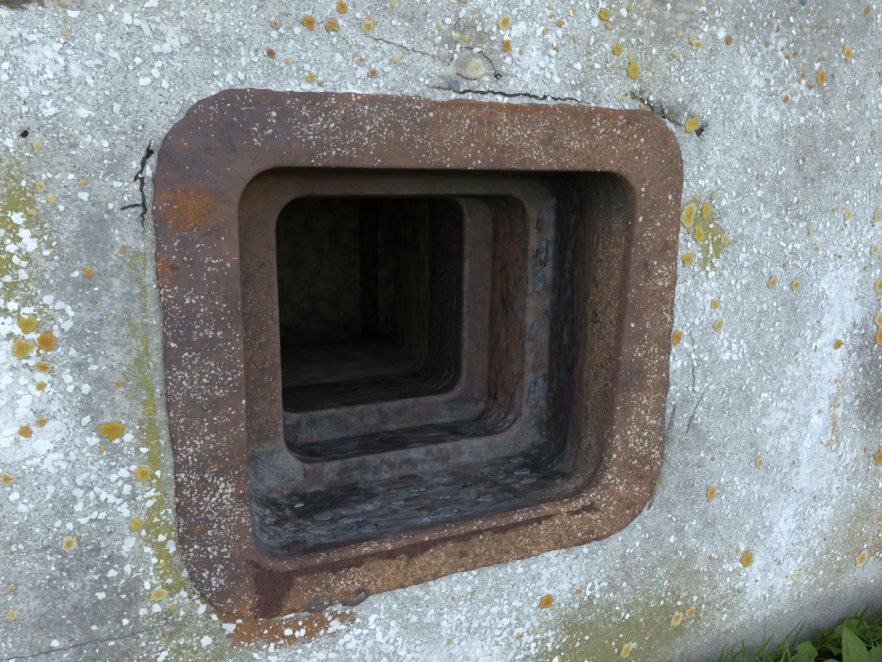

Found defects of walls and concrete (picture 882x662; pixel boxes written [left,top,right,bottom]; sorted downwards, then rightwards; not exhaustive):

crack [368,18,591,104]
rust [442,102,636,124]
crack [121,139,152,236]
rust [192,500,599,650]